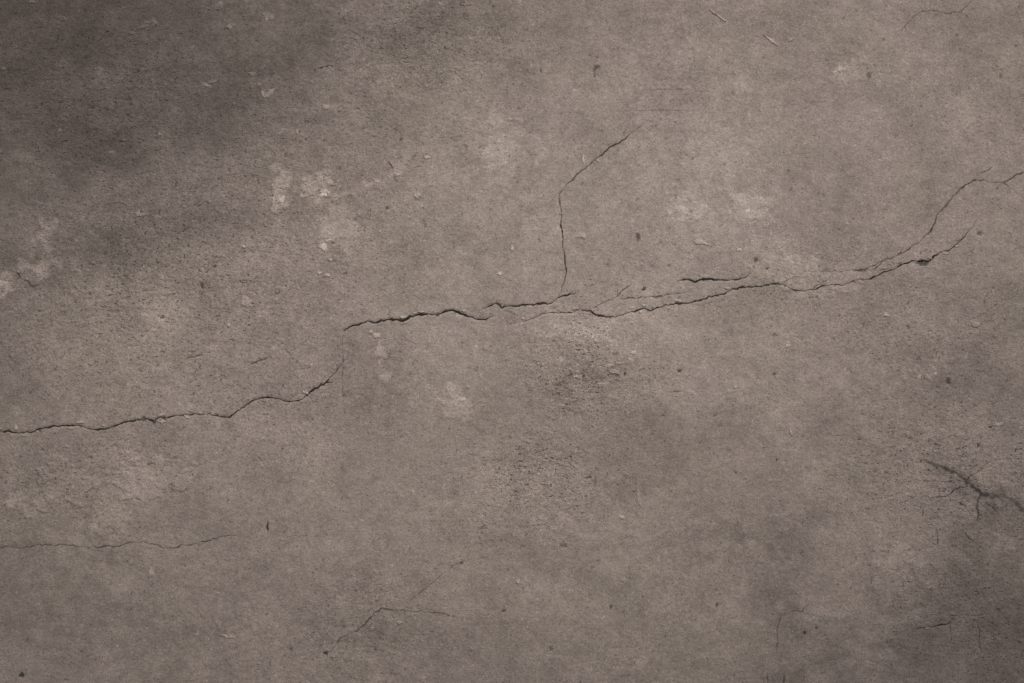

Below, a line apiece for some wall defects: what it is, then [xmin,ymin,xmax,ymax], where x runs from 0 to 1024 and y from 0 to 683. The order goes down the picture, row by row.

crack [343,220,976,332]
crack [0,364,342,437]